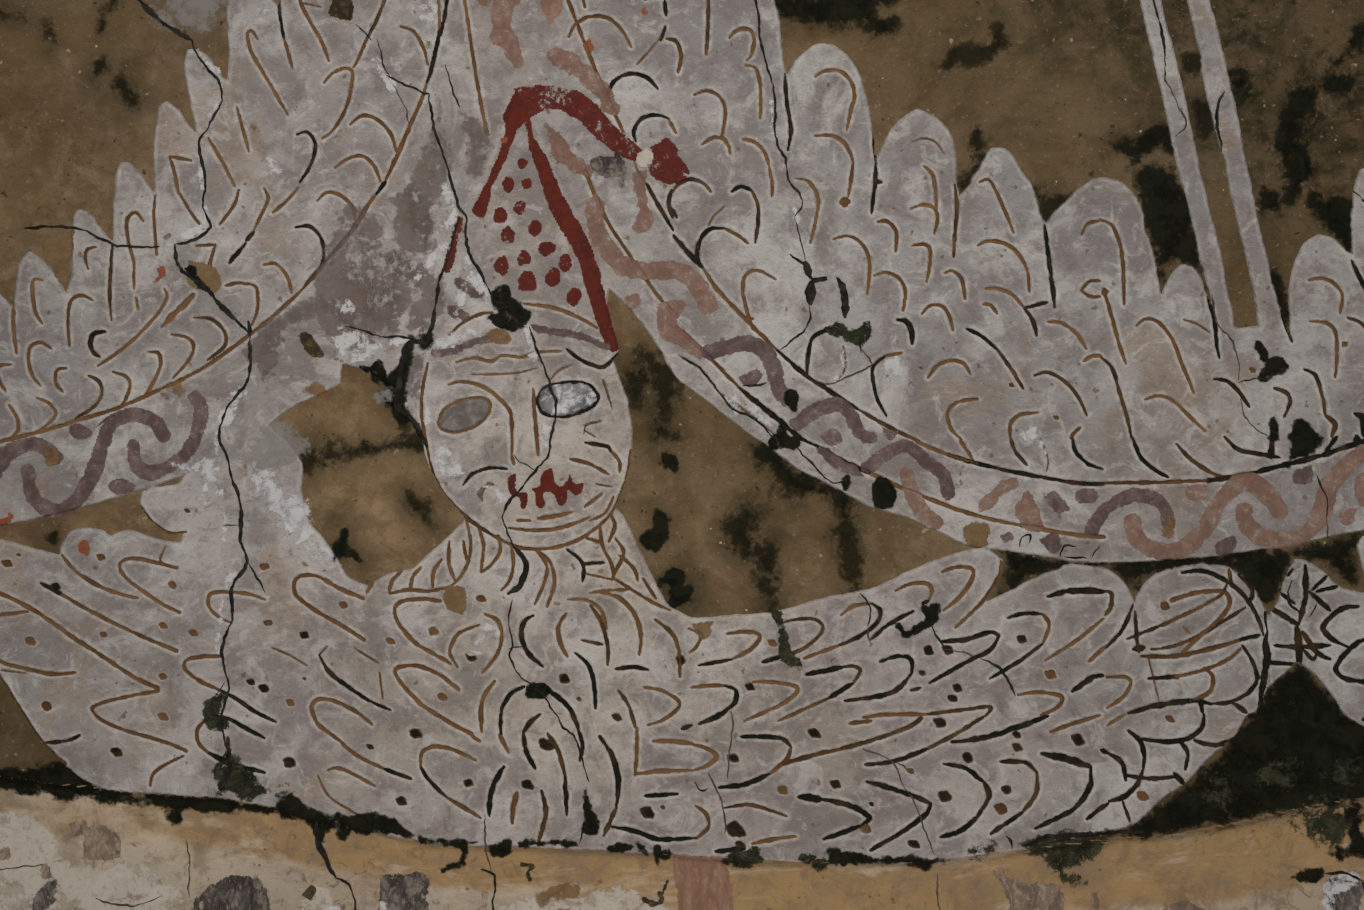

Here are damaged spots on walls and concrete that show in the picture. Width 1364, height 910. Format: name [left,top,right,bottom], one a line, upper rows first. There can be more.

leakage [941,22,1011,69]
leakage [167,152,208,246]
crack [754,0,873,385]
leakage [1034,187,1072,221]
crack [24,0,265,790]
leakage [622,345,683,440]
crack [682,358,851,484]
crack [501,326,613,781]
crack [1258,581,1318,711]
peeling [0,811,184,910]
peeling [300,883,333,910]
peeling [496,862,669,910]